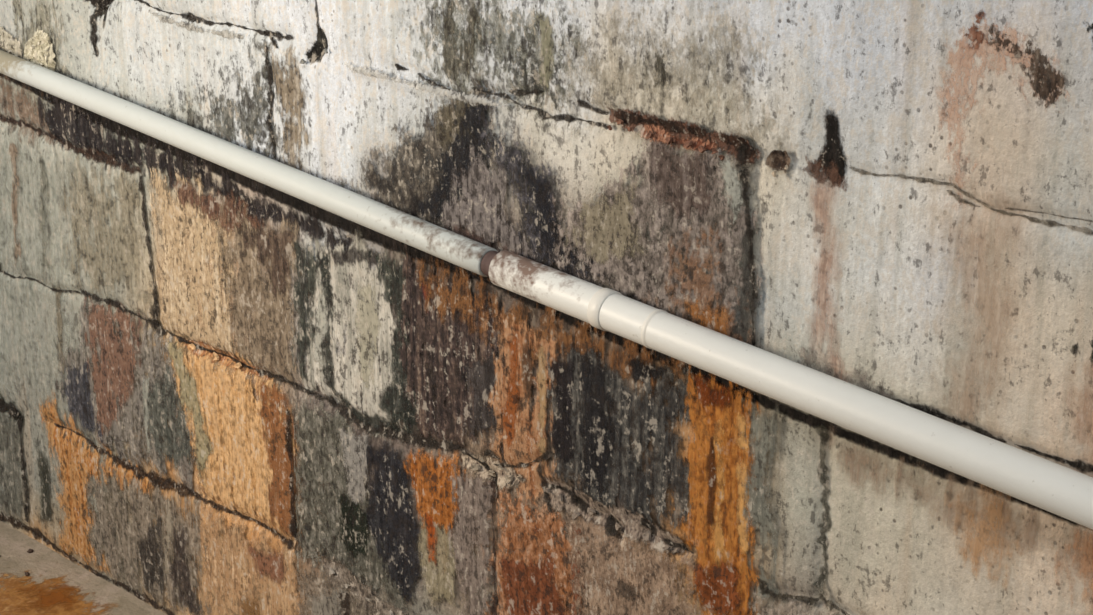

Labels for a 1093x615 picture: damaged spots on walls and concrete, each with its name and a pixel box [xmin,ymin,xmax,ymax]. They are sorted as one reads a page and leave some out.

peeling [0,26,55,71]
crack [86,0,293,158]
crack [395,64,608,129]
leakage [338,0,762,345]
rust [939,12,1068,201]
leakage [0,73,547,615]
crack [0,115,694,615]
rust [403,449,465,606]
spalling [461,453,526,490]
rust [418,260,760,615]
spalling [543,476,688,553]
leakage [546,309,1092,601]